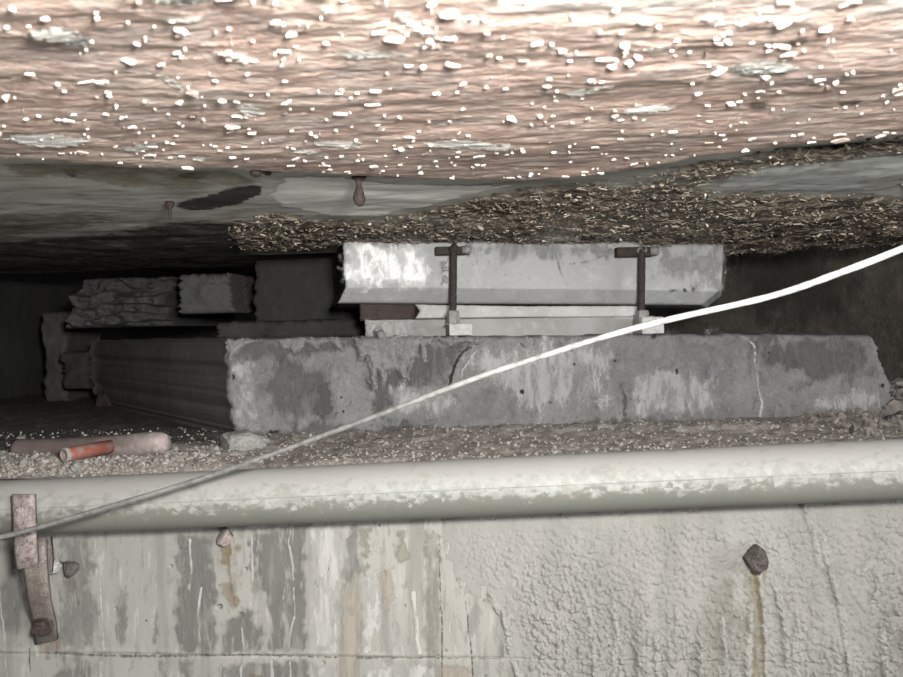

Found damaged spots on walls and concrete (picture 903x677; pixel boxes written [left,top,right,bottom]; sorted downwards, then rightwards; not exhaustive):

spalling [24,16,94,55]
peeling [596,30,680,70]
spalling [702,16,806,106]
peeling [0,114,90,156]
peeling [78,71,249,179]
peeling [218,94,271,144]
peeling [263,120,526,179]
peeling [611,104,675,141]
peeling [831,133,865,144]
damp [269,176,512,216]
crack [449,346,477,385]
corrosion [752,570,766,677]